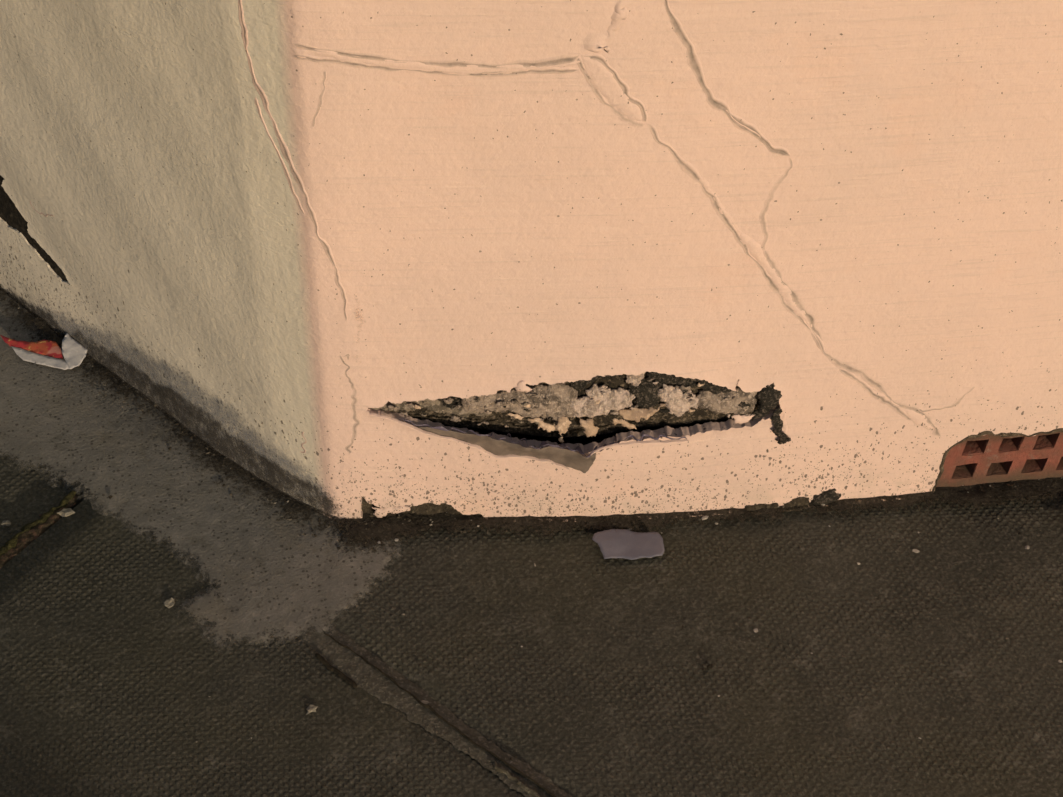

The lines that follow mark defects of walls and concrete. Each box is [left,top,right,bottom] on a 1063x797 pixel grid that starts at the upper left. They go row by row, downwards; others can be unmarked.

crack [238,0,347,324]
crack [291,0,976,438]
crack [340,354,370,454]